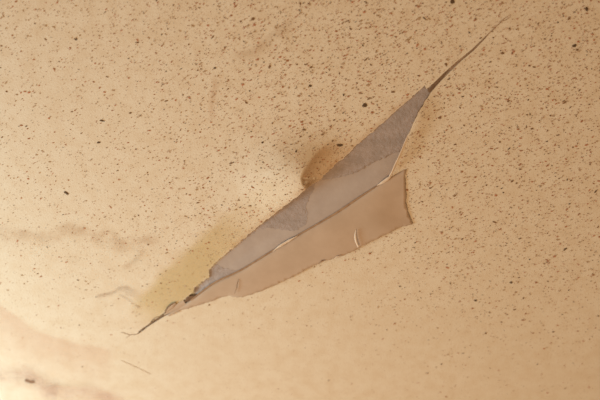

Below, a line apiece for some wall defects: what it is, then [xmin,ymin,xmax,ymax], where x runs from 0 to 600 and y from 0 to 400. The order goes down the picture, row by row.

crack [428,16,511,92]
peeling [139,35,488,333]
crack [121,314,166,336]